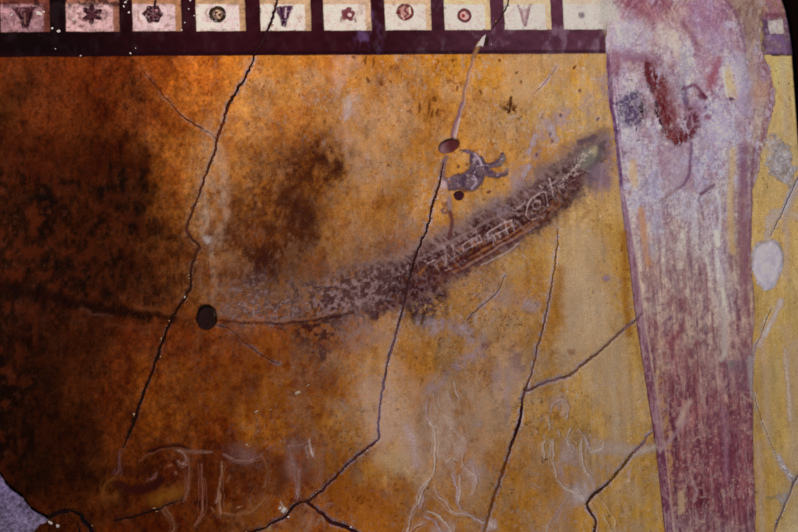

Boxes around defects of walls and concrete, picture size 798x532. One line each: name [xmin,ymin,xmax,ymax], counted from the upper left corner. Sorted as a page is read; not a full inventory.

crack [123,0,278,447]
crack [771,178,798,235]
crack [246,162,444,532]
crack [483,232,652,532]
flaking render [0,473,49,532]
crack [48,509,94,532]
crack [114,499,182,521]
crack [755,398,798,532]